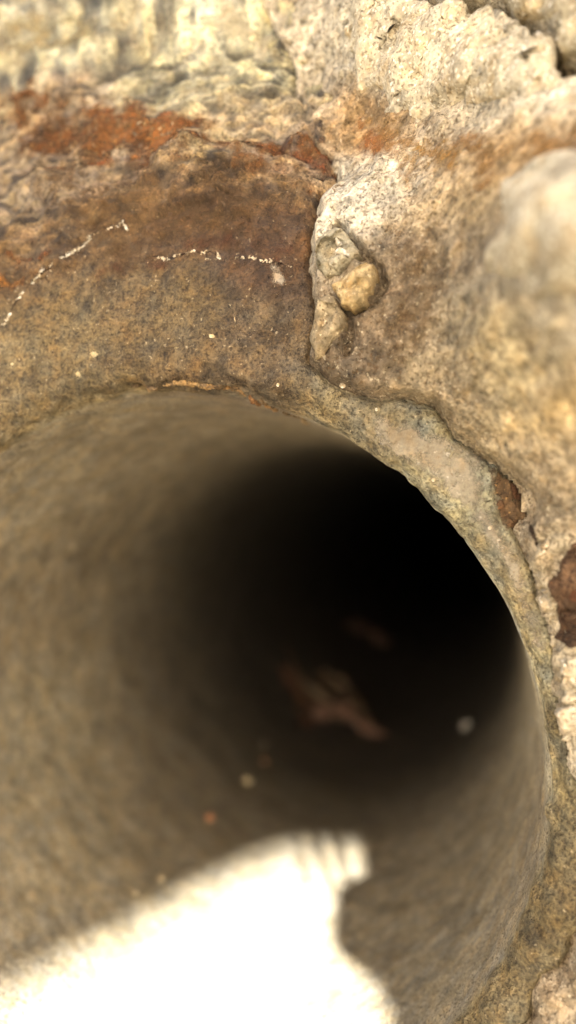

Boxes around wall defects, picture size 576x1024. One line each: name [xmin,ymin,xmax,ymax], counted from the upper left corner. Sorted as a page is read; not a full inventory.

rust [0,72,336,195]